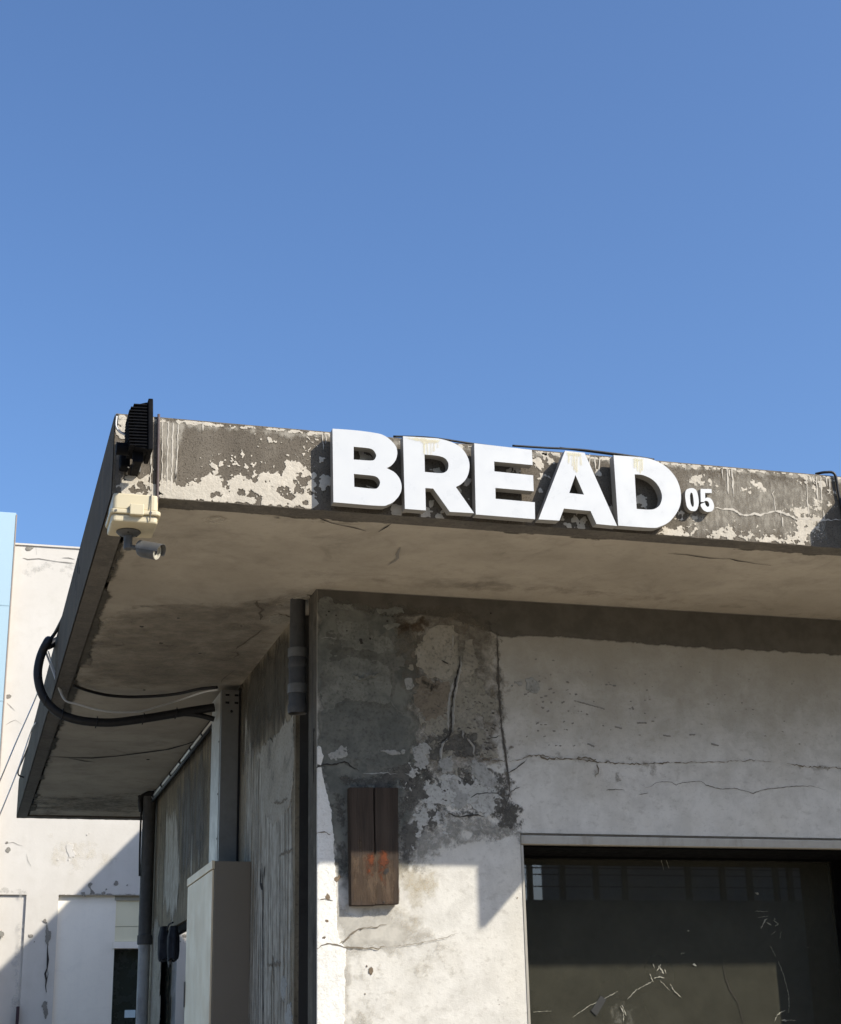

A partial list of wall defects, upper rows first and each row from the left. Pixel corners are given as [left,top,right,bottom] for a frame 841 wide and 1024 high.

peeling [115,415,127,439]
peeling [116,417,331,509]
damp [150,418,330,492]
peeling [657,461,841,545]
peeling [319,596,404,654]
peeling [381,625,504,850]
crack [438,635,841,817]
damp [29,543,293,1024]
crack [316,924,457,950]